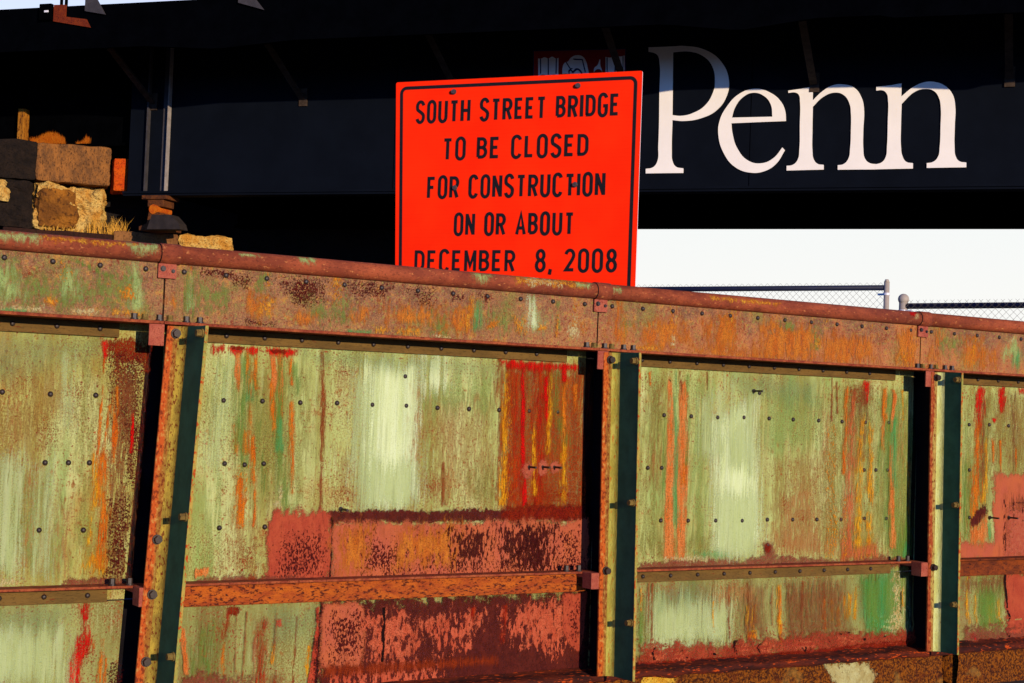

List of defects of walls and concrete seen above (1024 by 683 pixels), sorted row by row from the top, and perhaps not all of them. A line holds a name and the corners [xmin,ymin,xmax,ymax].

corrosion [293,278,369,325]
corrosion [383,296,478,338]
corrosion [633,295,875,364]
corrosion [896,311,918,367]
corrosion [77,337,152,581]
corrosion [494,359,592,512]
corrosion [663,373,689,560]
corrosion [822,378,910,561]
corrosion [964,387,1017,538]